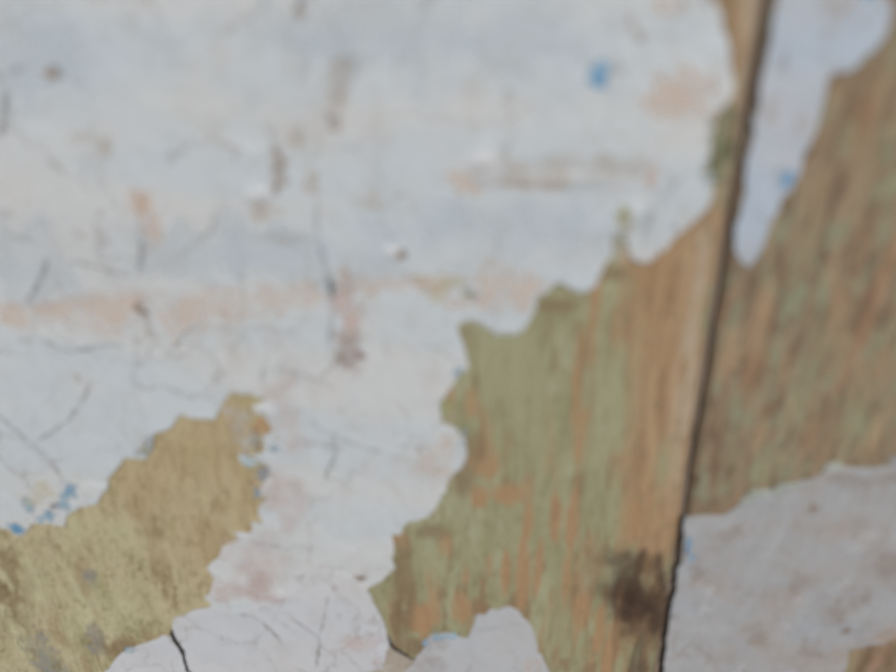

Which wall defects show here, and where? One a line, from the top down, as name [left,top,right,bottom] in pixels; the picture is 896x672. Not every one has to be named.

peeling [172,0,759,672]
peeling [686,0,896,516]
peeling [0,393,272,672]
crack [174,641,190,672]
peeling [844,639,896,672]